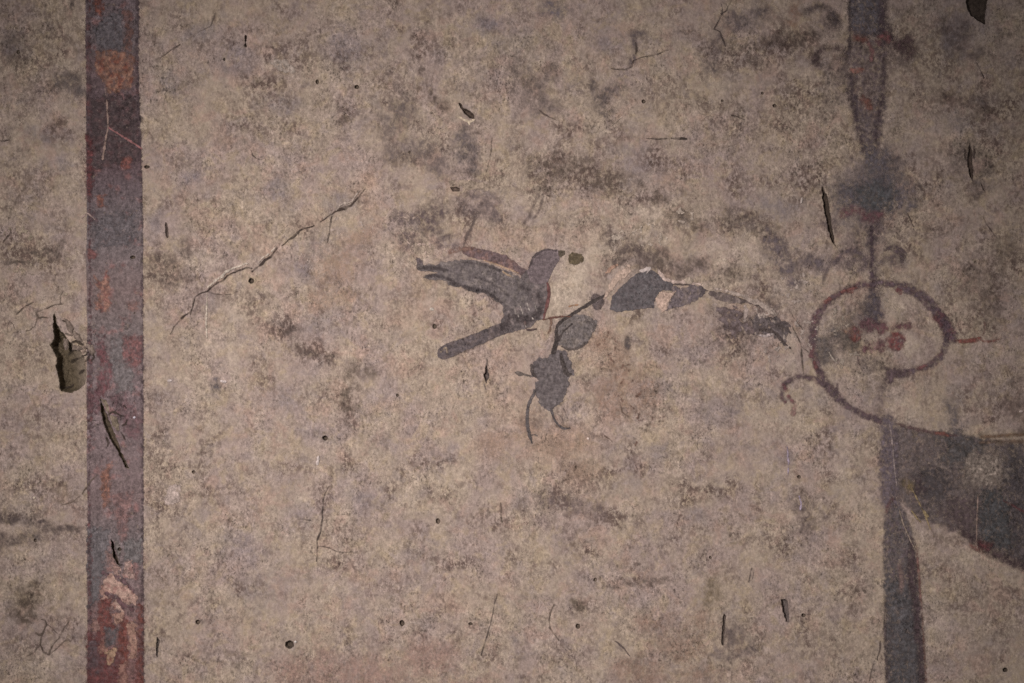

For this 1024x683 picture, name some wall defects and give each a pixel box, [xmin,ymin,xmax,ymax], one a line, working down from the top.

spalling [966,0,987,24]
crack [170,190,364,334]
flaking render [603,264,701,312]
flaking render [50,313,143,480]